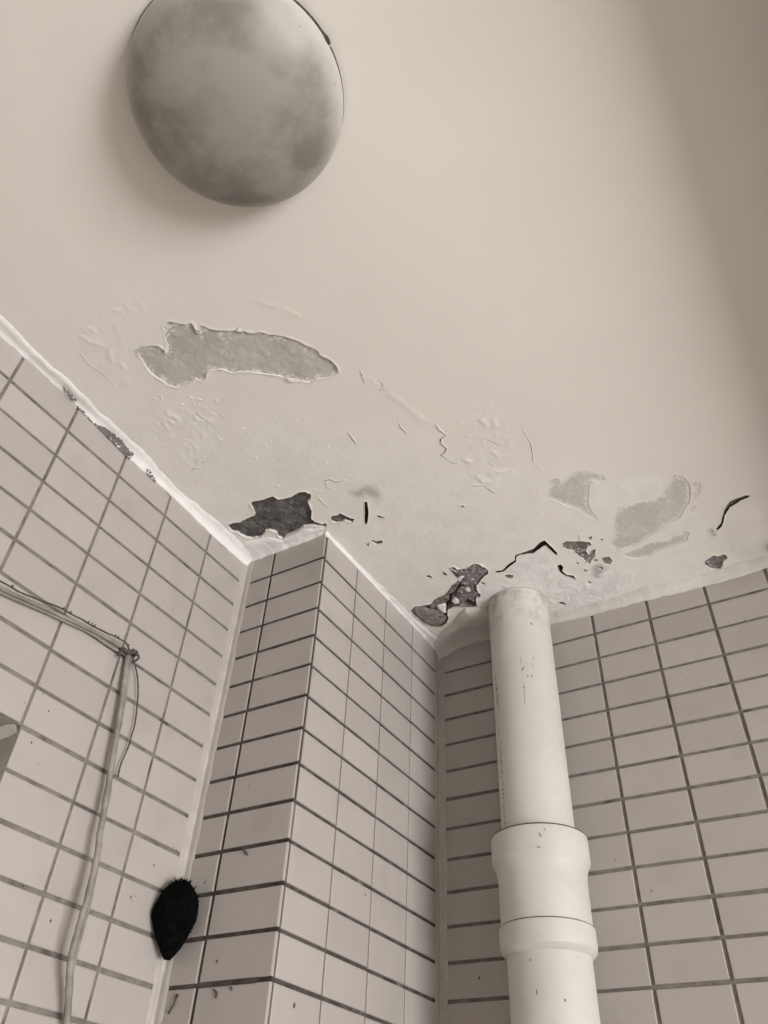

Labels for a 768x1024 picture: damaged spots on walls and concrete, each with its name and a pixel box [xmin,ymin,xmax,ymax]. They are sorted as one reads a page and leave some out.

peeling [134,318,341,390]
flaking render [225,490,356,540]
peeling [548,471,606,520]
peeling [561,475,701,584]
crack [714,493,752,531]
flaking render [409,563,490,628]
crack [494,539,577,603]
flaking render [703,553,729,571]